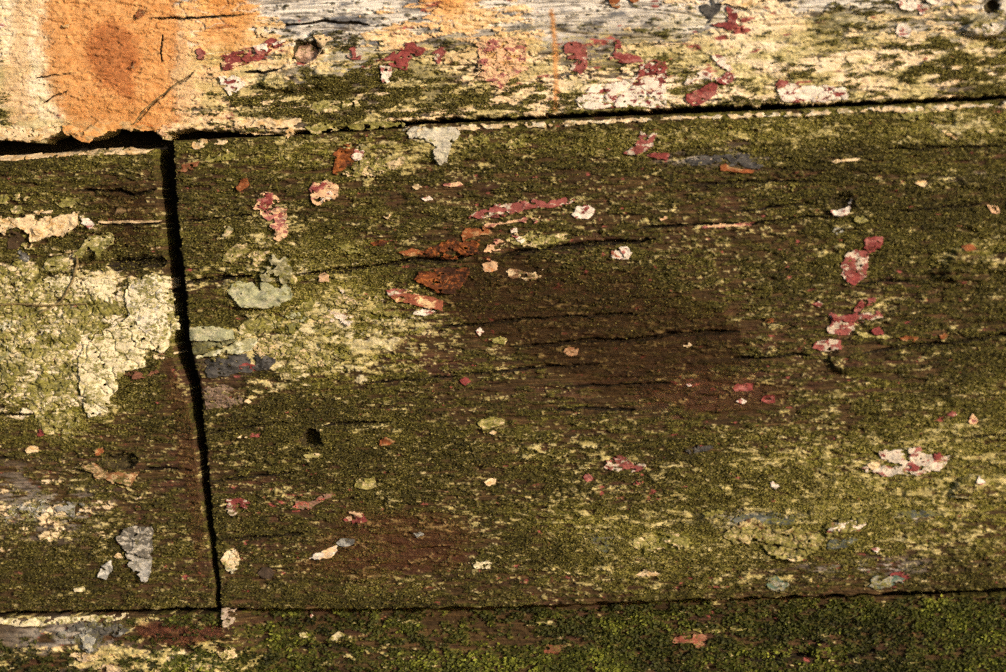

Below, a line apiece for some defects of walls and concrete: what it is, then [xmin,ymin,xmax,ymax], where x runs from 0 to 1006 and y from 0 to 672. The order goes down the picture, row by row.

crack [148,14,370,62]
crack [245,67,282,75]
peeling [0,120,168,161]
crack [137,72,194,123]
peeling [234,37,1006,206]
peeling [461,197,595,281]
crack [298,179,832,275]
crack [186,275,252,283]
peeling [0,191,443,453]
peeling [862,446,953,477]
peeling [97,526,154,582]
peeling [723,515,867,562]